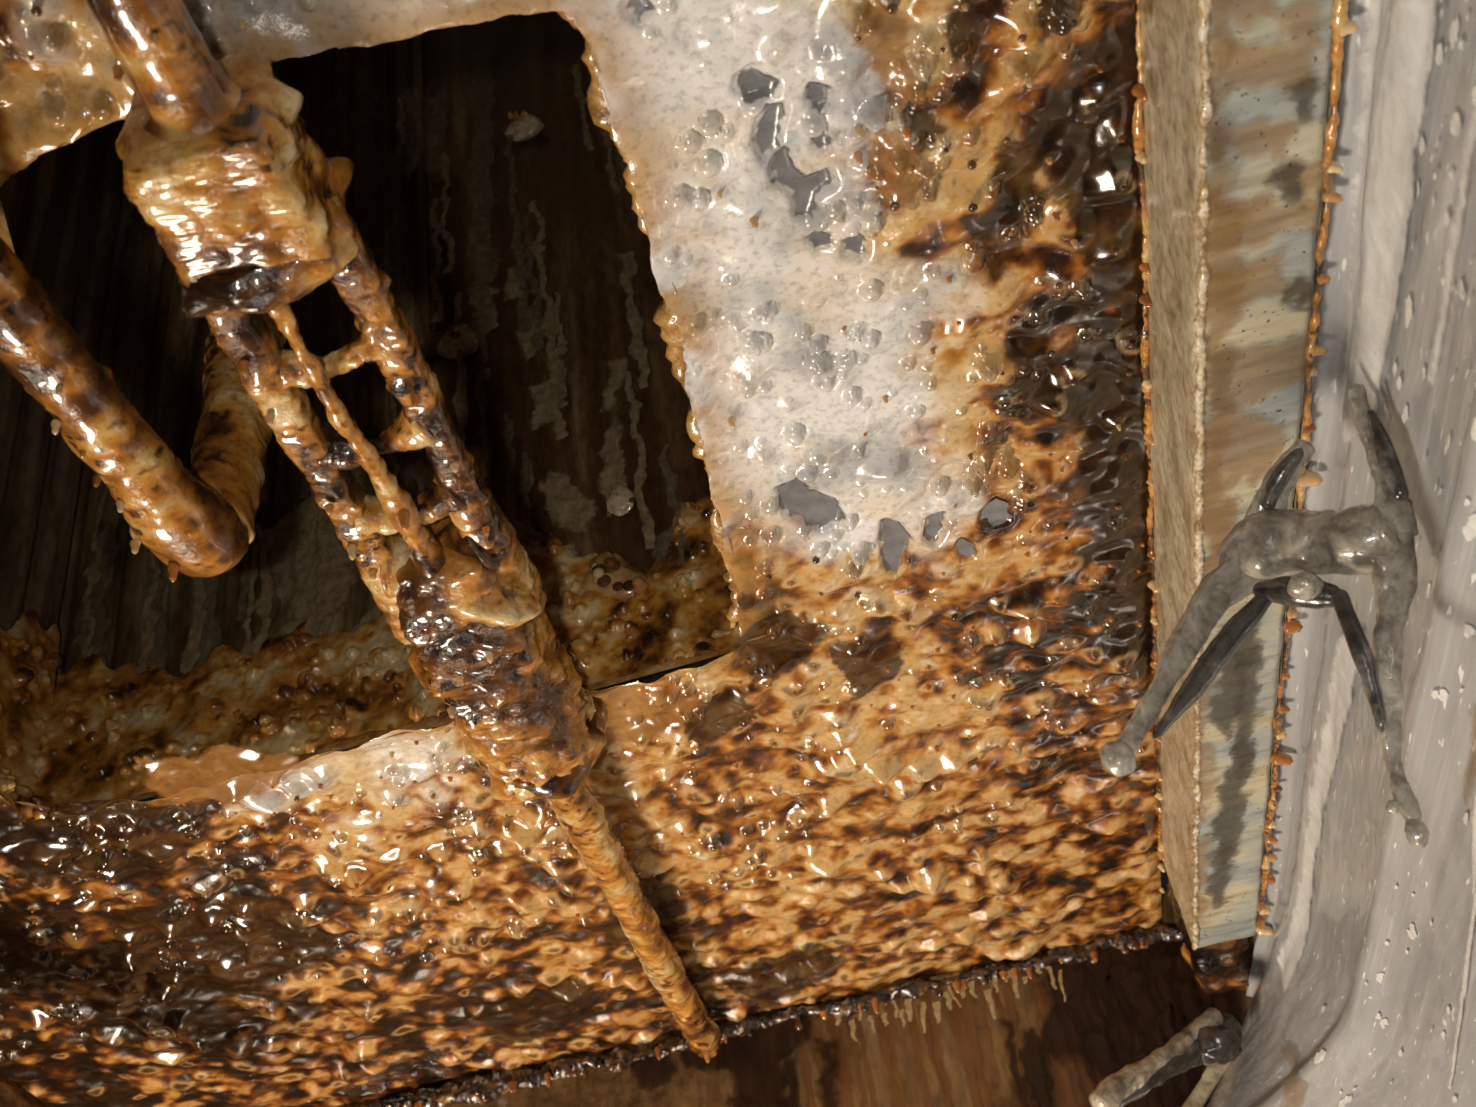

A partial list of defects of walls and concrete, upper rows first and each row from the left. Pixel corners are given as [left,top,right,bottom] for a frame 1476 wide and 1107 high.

peeling [737,70,866,253]
water stain [904,101,945,156]
corrosion [1301,0,1349,443]
water stain [354,48,688,562]
corrosion [1131,0,1159,682]
peeling [778,479,845,528]
peeling [879,511,945,575]
peeling [979,498,1012,527]
corrosion [601,687,705,747]
corrosion [146,745,308,805]
corrosion [786,972,1052,1107]
water stain [835,964,1066,1042]